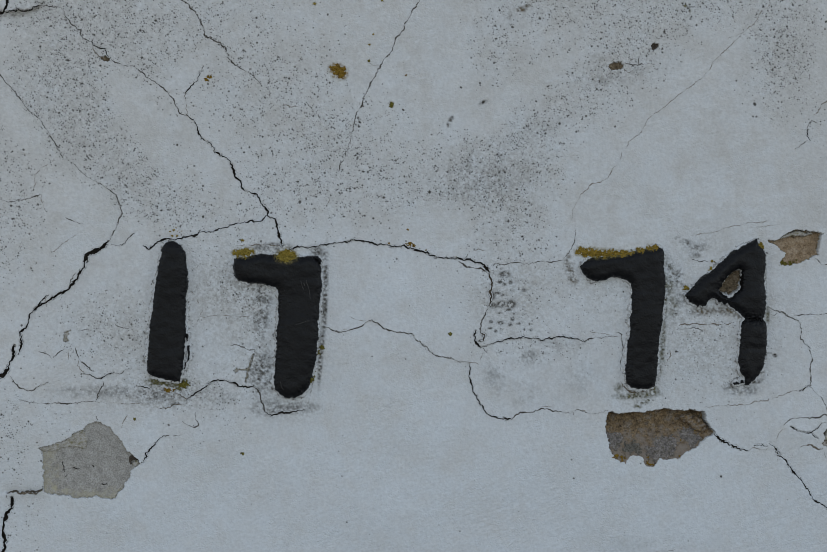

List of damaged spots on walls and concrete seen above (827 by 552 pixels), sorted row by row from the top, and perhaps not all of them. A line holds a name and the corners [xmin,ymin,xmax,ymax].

crack [795,101,827,149]
crack [0,0,780,428]
spalling [768,230,820,265]
spalling [39,422,140,499]
crack [142,378,313,463]
spalling [605,408,713,467]
crack [712,310,827,511]
crack [0,488,43,552]